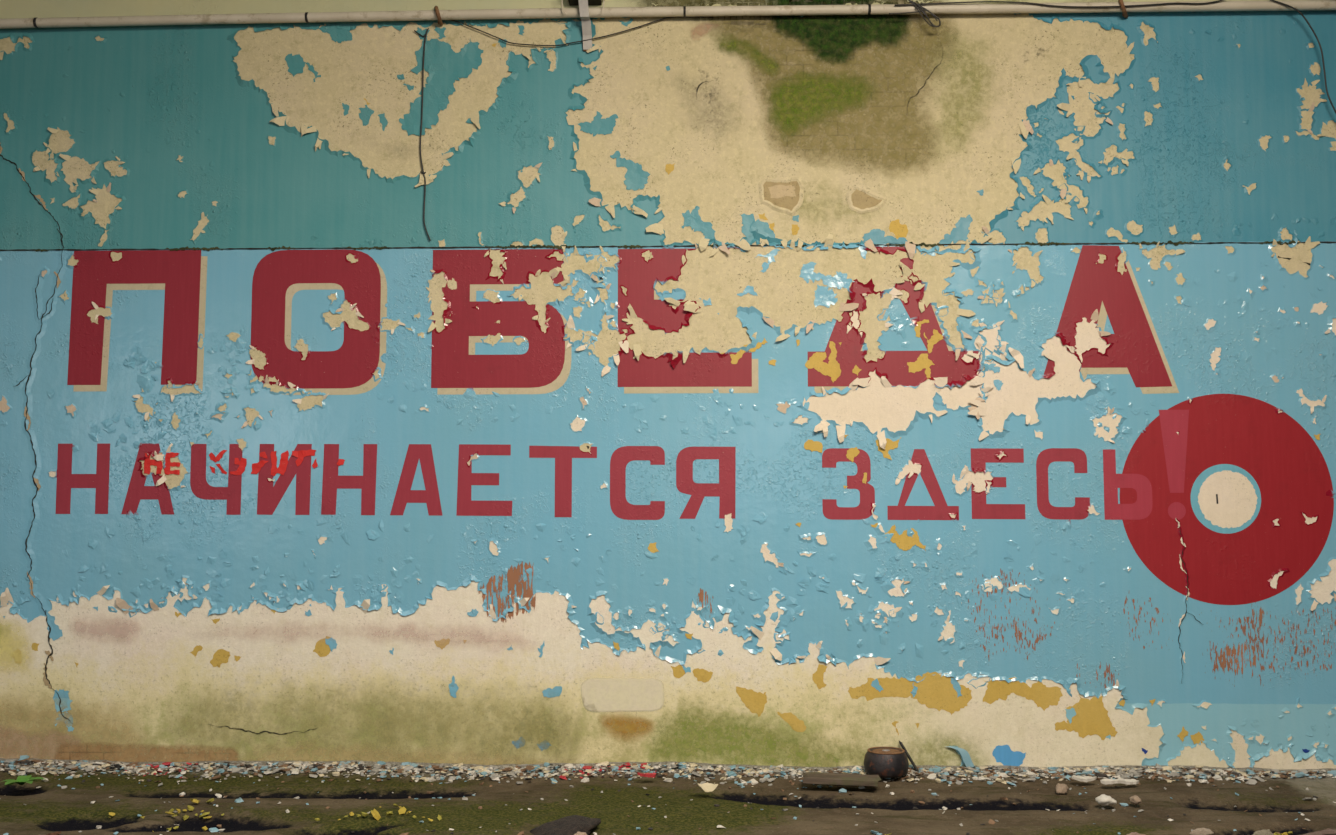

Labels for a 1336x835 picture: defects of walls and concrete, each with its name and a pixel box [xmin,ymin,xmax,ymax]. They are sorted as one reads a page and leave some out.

peeling [0,34,35,60]
leakage [645,0,950,170]
peeling [30,126,130,263]
peeling [227,0,1203,534]
peeling [1246,226,1336,300]
peeling [132,331,329,491]
crack [0,126,1336,732]
peeling [1203,317,1223,377]
peeling [1270,374,1327,440]
corrosion [479,561,536,623]
peeling [0,503,1336,835]
corrosion [1199,602,1336,687]